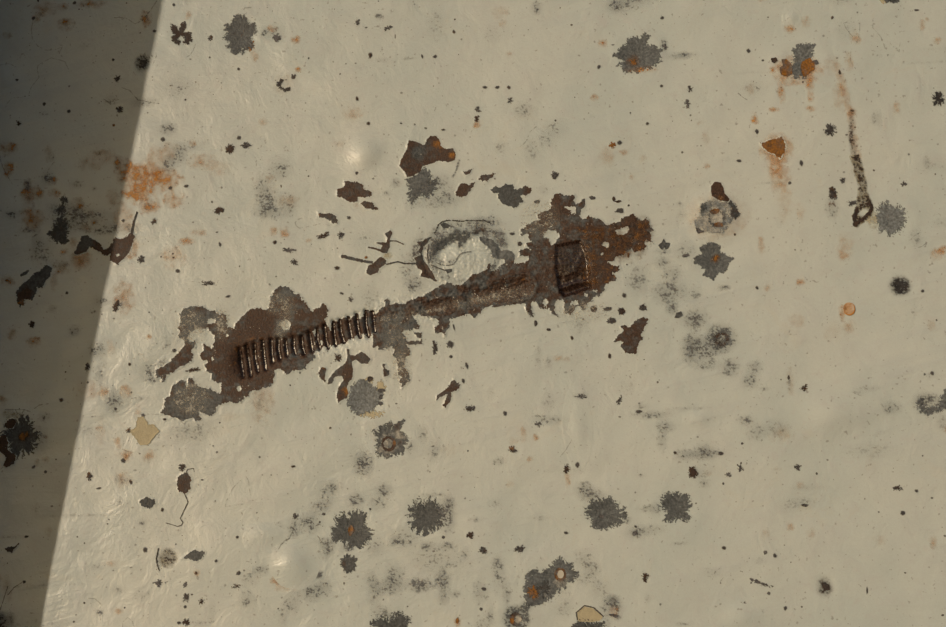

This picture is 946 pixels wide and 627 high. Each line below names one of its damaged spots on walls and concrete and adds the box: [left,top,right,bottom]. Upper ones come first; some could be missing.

peeling [208,14,257,55]
peeling [612,33,667,74]
peeling [771,43,819,86]
peeling [397,129,540,210]
corrosion [848,123,873,227]
peeling [5,196,144,309]
spalling [682,180,741,281]
peeling [316,346,408,471]
peeling [434,363,468,410]
peeling [322,511,374,573]
peeling [405,496,452,539]
peeling [504,556,579,627]